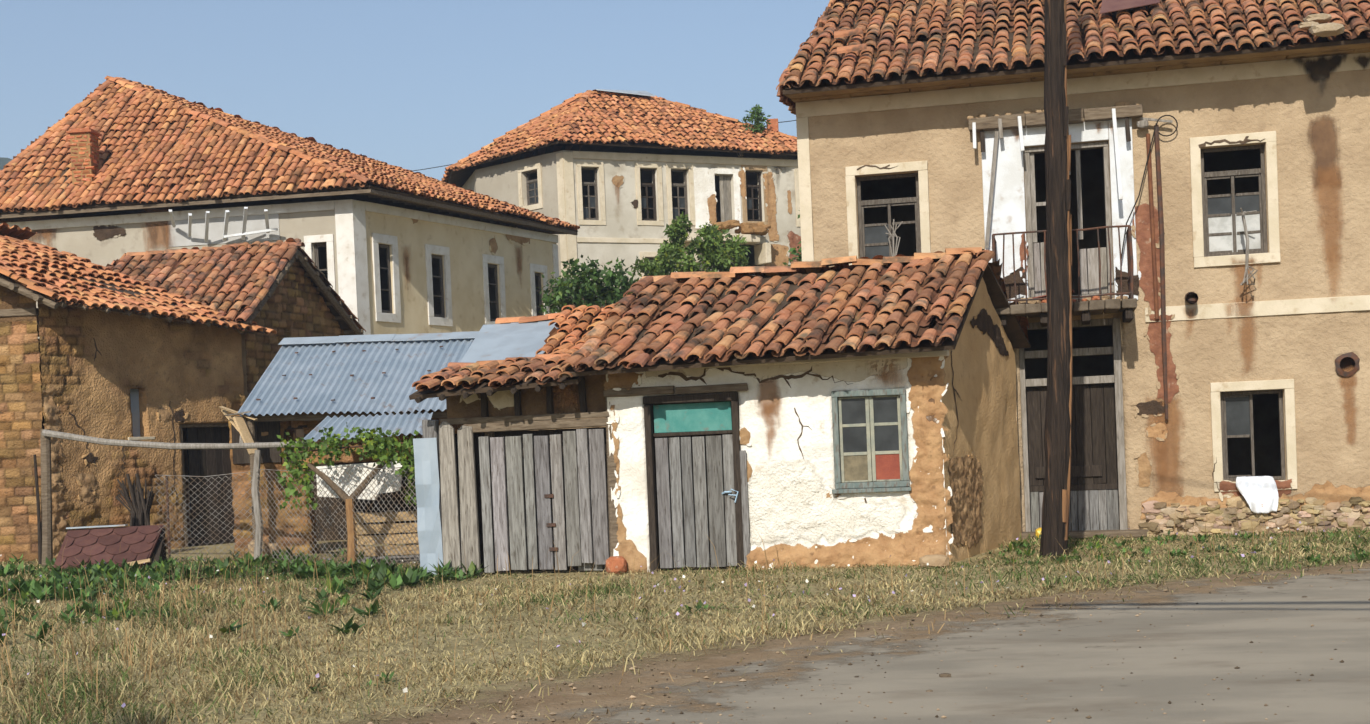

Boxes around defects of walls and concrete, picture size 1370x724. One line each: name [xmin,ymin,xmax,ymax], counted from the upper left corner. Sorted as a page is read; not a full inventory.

leakage [1295,53,1370,89]
leakage [1309,116,1341,286]
flaking render [603,368,708,573]
crack [658,367,852,459]
leakage [760,380,778,443]
flaking render [730,356,984,570]